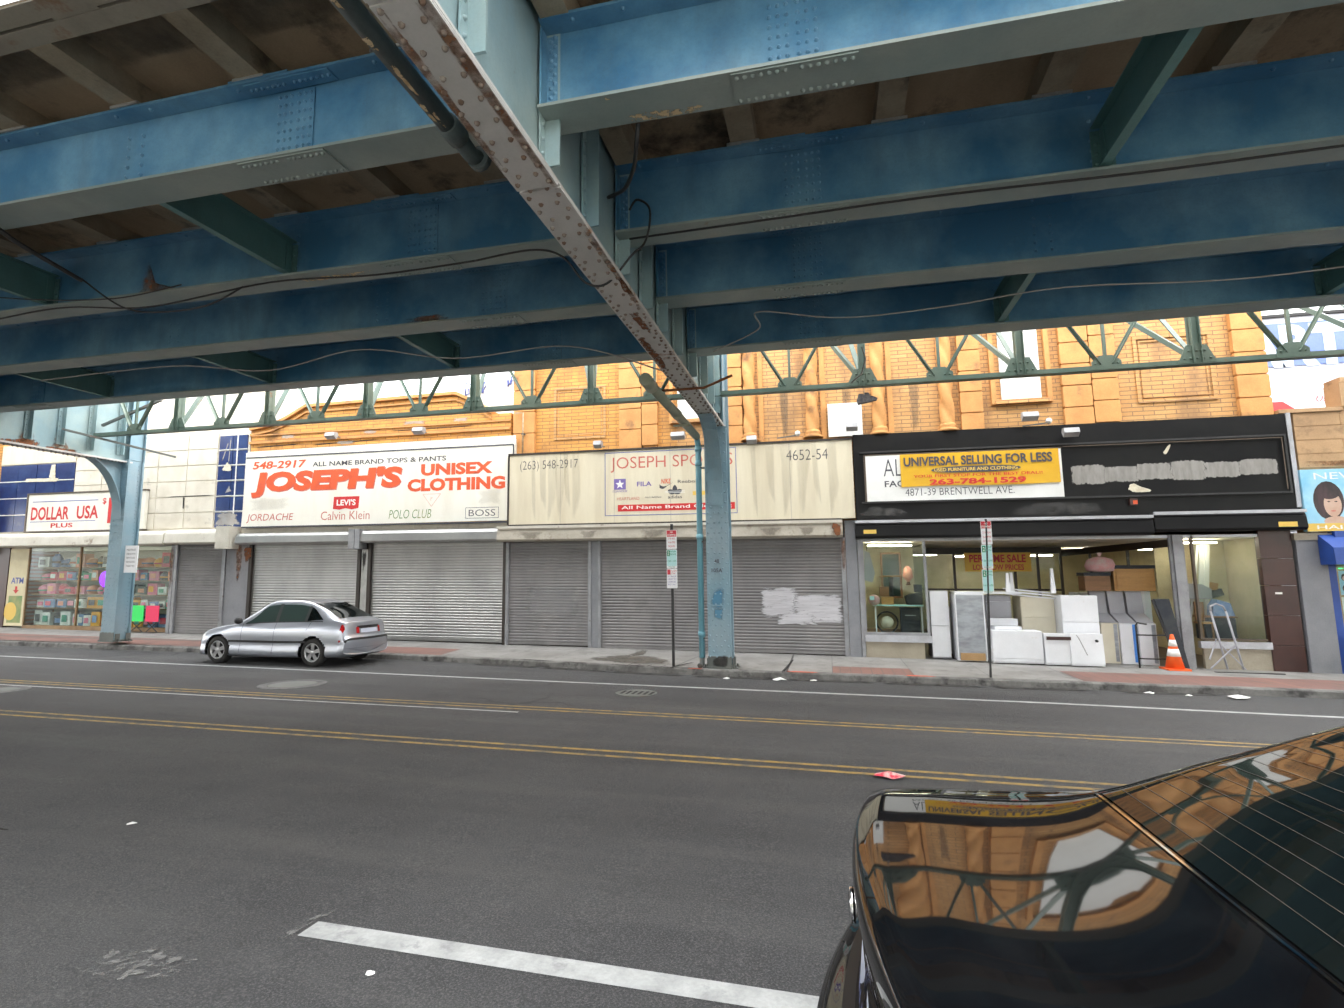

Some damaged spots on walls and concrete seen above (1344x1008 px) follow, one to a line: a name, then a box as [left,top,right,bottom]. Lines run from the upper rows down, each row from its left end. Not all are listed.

corrosion [393,33,494,161]
corrosion [438,25,553,184]
corrosion [590,242,666,369]